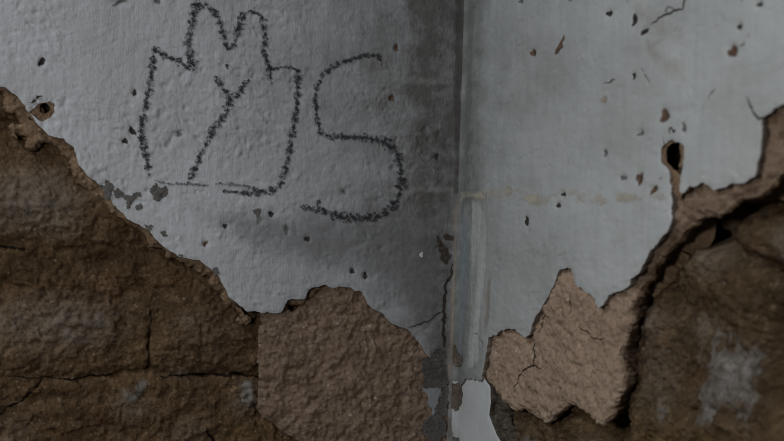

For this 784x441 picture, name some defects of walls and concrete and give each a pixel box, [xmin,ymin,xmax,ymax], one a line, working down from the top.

crack [649,0,685,25]
spalling [0,87,449,441]
peeling [437,234,454,264]
spalling [451,106,784,441]
leakage [701,349,760,421]